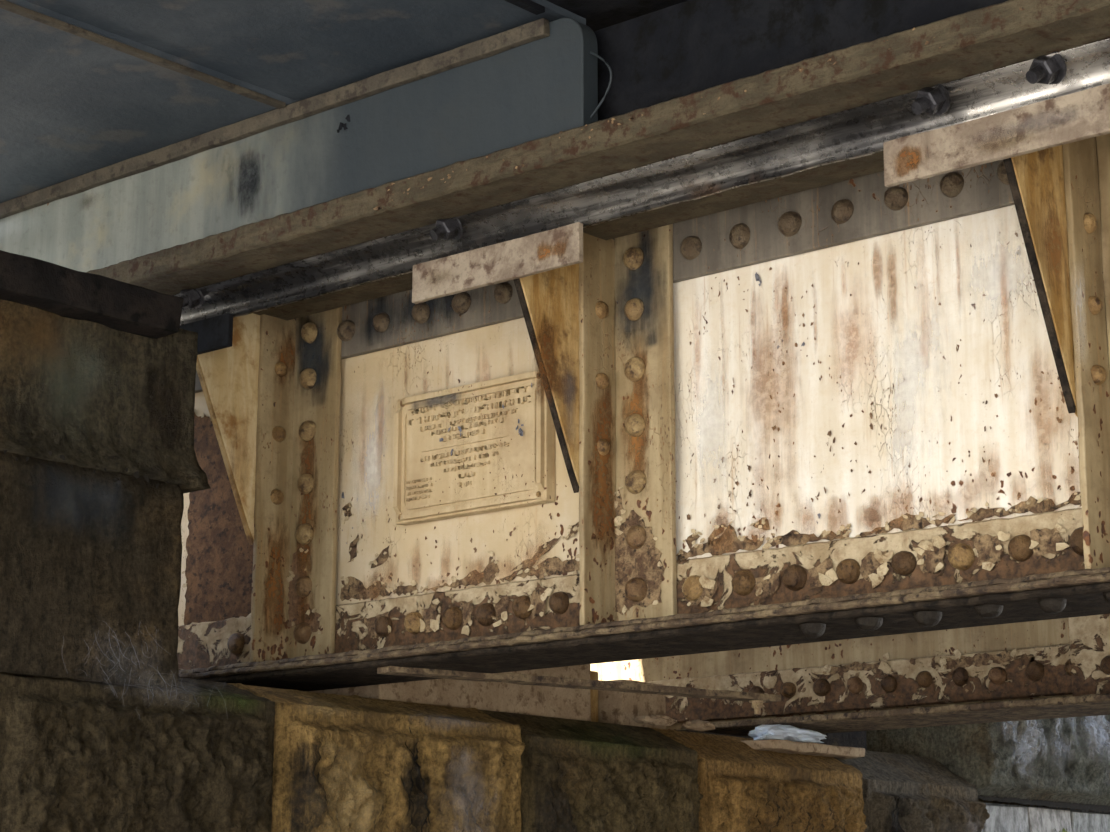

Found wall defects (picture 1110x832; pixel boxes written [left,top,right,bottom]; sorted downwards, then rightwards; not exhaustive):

leakage [238,160,259,208]
rust [1044,192,1068,293]
rust [590,354,648,561]
rust [264,436,317,635]
peeling [341,492,359,562]
peeling [339,521,580,639]
spalling [613,486,664,615]
peeling [681,575,720,607]
peeling [807,559,838,589]
rust [864,509,879,526]
peeling [859,549,894,588]
peeling [676,457,1081,574]